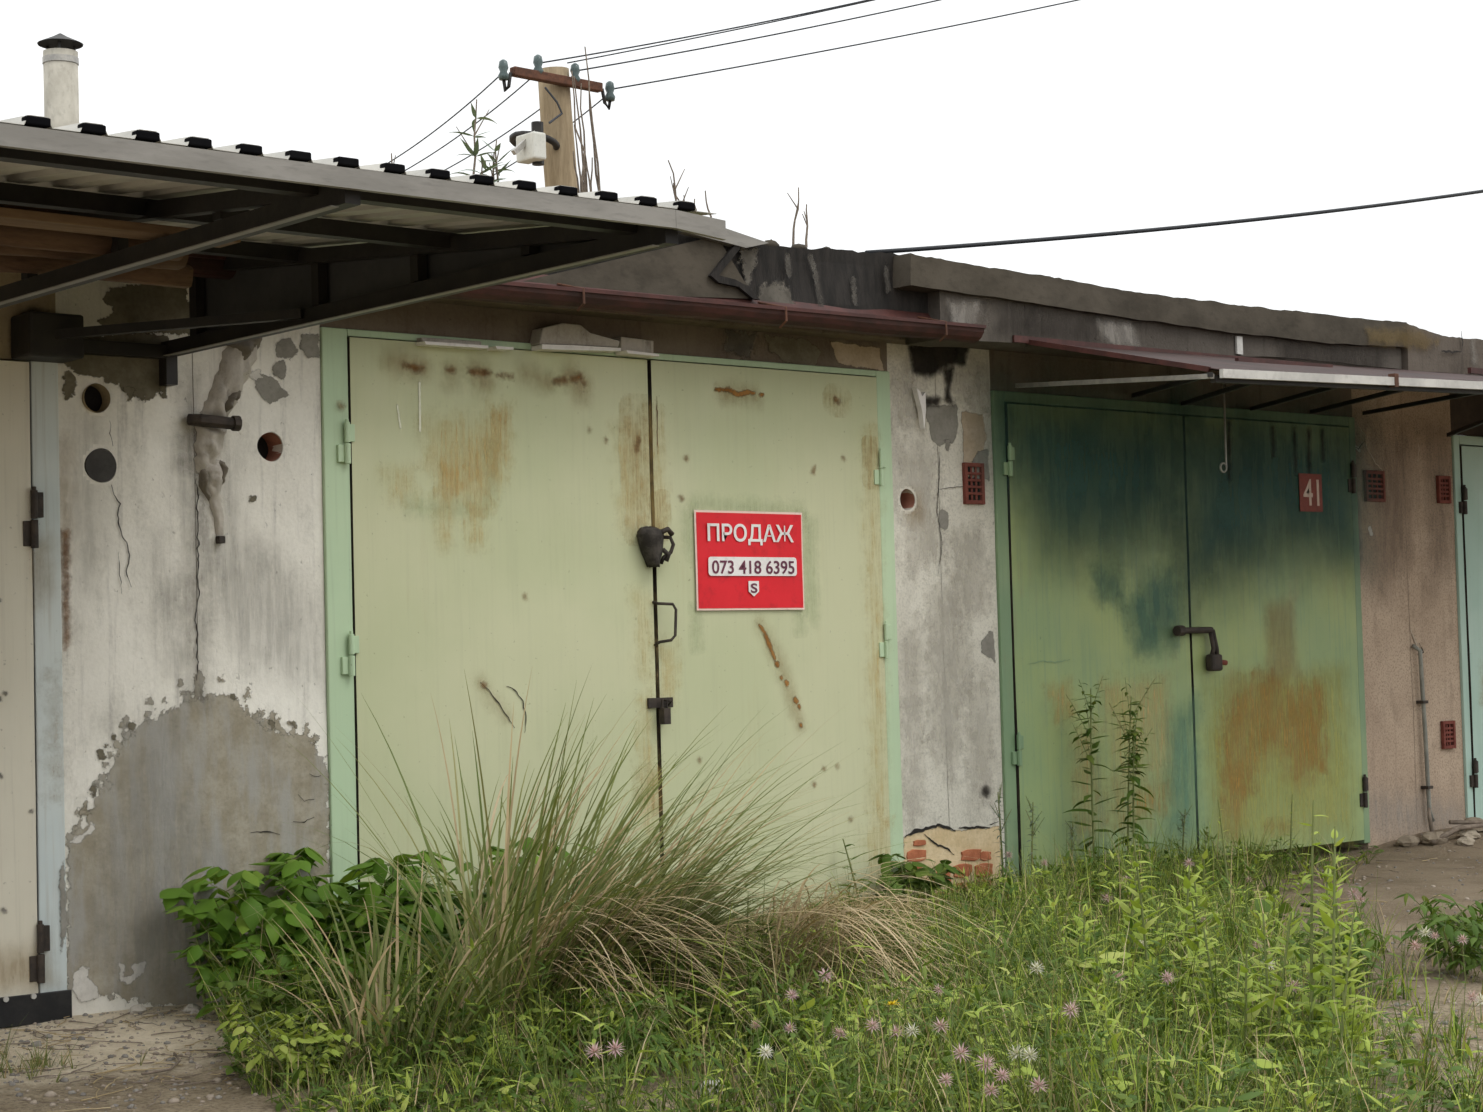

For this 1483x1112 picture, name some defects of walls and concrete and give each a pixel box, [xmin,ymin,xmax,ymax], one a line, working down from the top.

peeling [250,334,320,404]
crack [111,485,131,594]
crack [193,478,201,680]
rust [759,624,803,728]
spalling [58,670,331,1006]
spalling [904,826,1002,896]